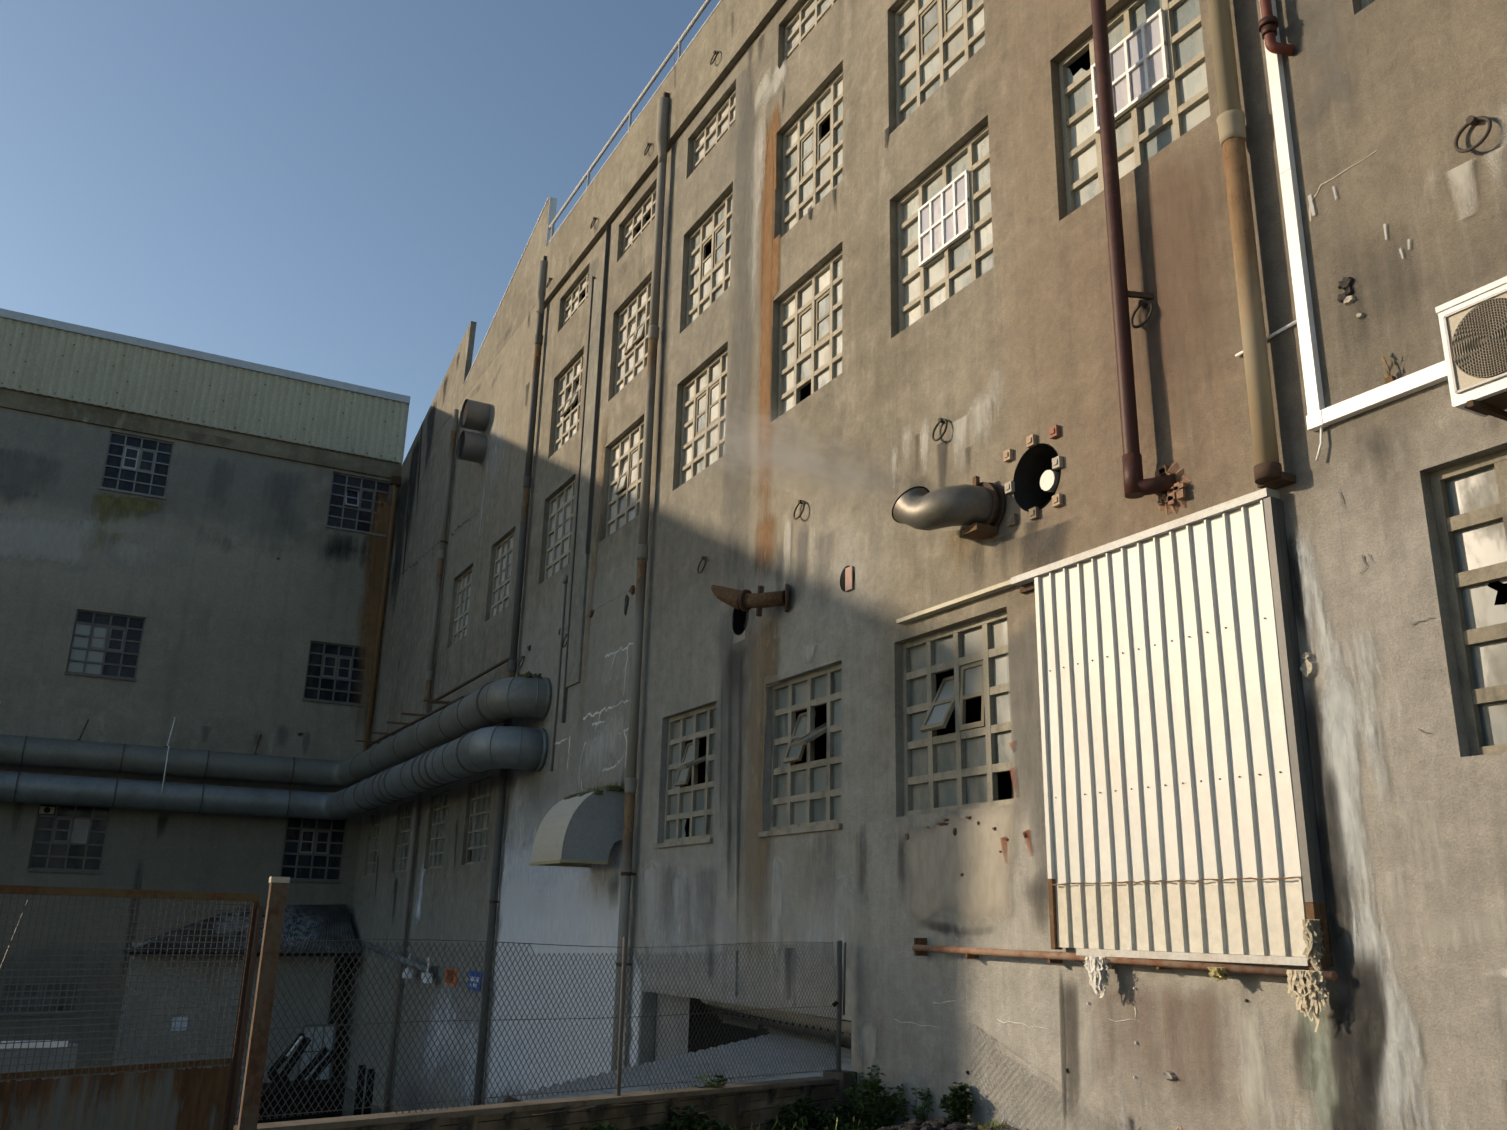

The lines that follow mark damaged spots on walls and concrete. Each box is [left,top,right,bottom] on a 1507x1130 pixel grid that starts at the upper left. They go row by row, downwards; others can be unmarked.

rust [759,108,780,500]
damp [1287,538,1413,1130]